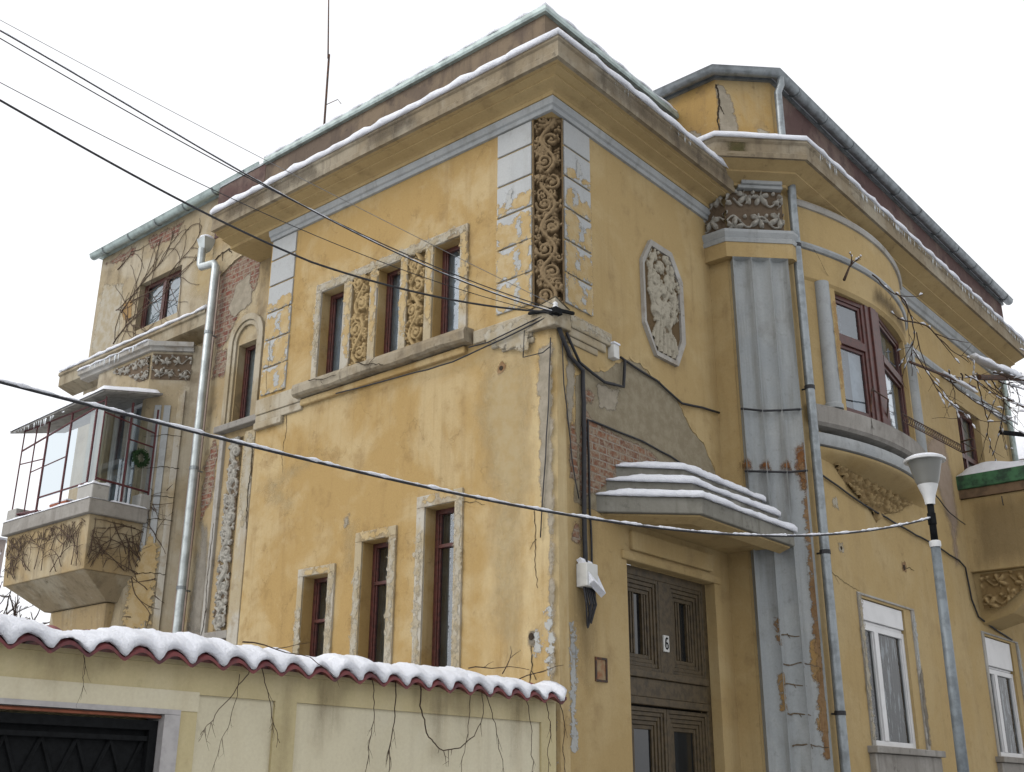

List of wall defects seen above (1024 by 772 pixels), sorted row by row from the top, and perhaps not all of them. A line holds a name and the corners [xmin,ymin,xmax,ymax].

crack [715,84,724,130]
peeling [565,160,611,341]
flaking render [195,255,260,380]
peeling [260,292,292,396]
peeling [482,189,556,680]
peeling [566,346,717,513]
peeling [410,532,423,665]
peeling [422,488,464,667]
peeling [795,443,830,759]
peeling [556,621,579,753]
peeling [777,673,787,711]